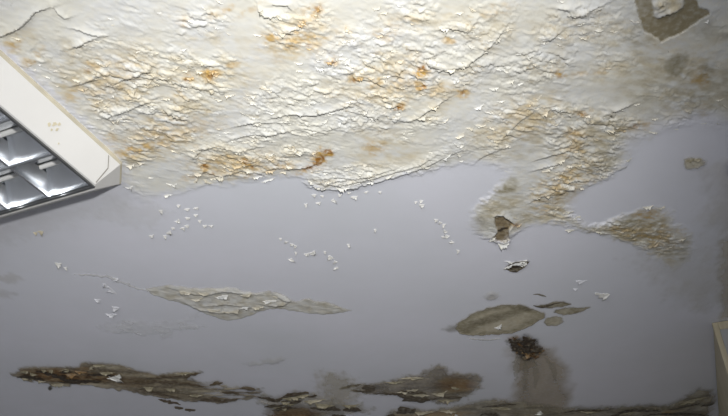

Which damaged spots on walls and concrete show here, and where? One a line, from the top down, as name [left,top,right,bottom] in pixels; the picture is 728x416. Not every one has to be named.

corrosion [263,3,336,51]
corrosion [344,72,367,87]
corrosion [408,63,432,95]
corrosion [387,100,411,114]
peeling [0,0,728,273]
corrosion [298,148,336,175]
peeling [146,285,348,320]
flaking render [456,302,590,336]
damp [508,336,545,371]
flaking render [10,362,362,416]
flaking render [340,366,714,416]